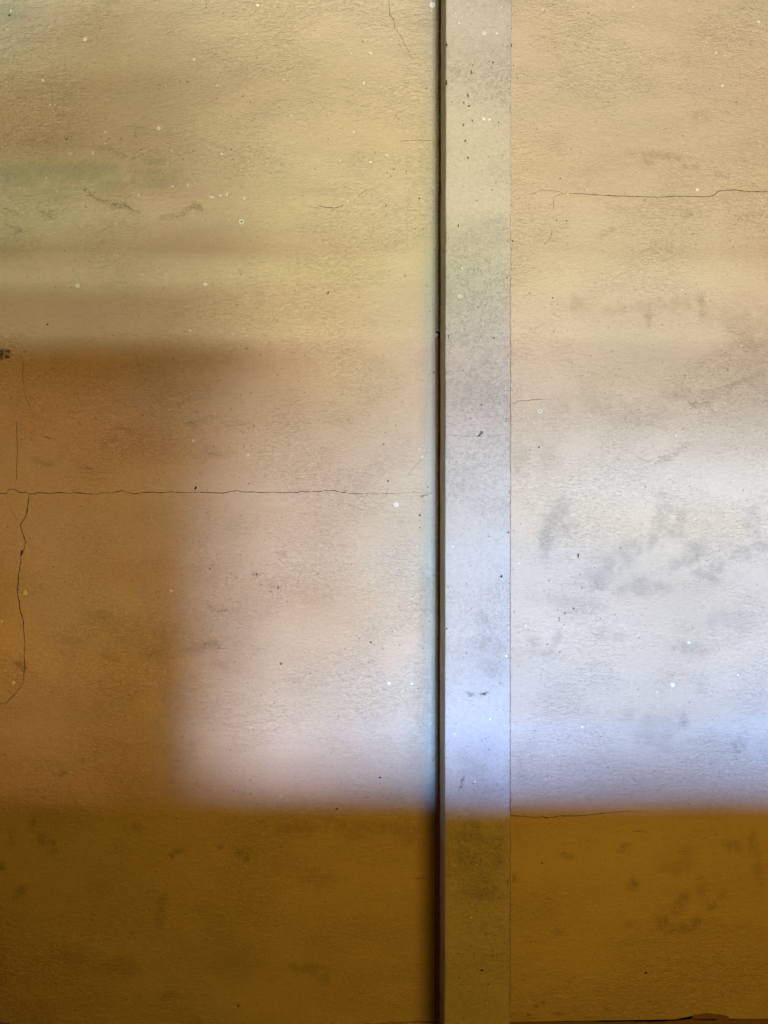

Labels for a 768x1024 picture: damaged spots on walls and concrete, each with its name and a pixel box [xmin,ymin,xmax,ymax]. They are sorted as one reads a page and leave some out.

crack [0,374,387,704]